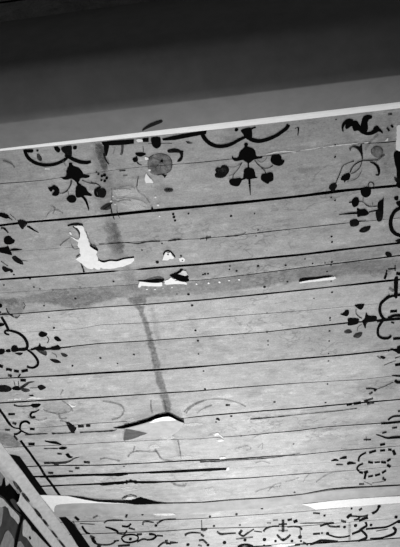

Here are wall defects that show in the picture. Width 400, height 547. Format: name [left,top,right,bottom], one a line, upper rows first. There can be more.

peeling [60,223,134,270]
peeling [156,250,185,264]
peeling [135,269,189,290]
peeling [40,494,166,512]
peeling [302,496,400,510]